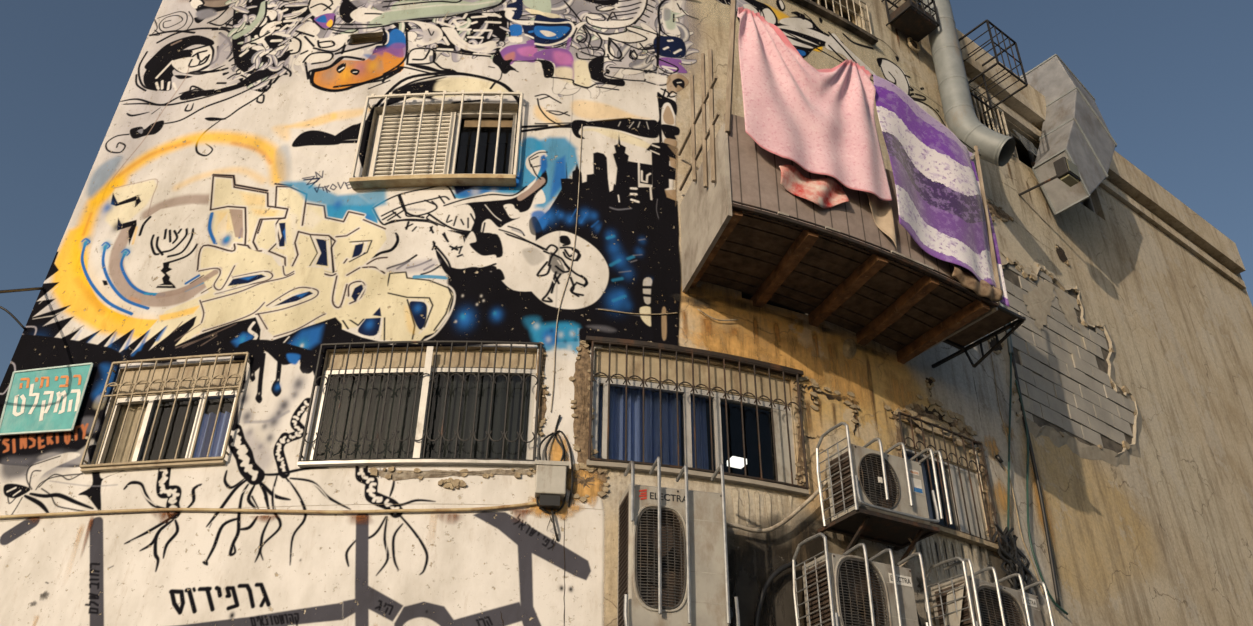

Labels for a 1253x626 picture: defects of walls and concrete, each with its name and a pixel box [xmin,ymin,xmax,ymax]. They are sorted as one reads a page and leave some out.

spalling [987,199,1014,222]
spalling [566,340,610,503]
water stain [683,297,912,426]
flaking render [987,244,1142,467]